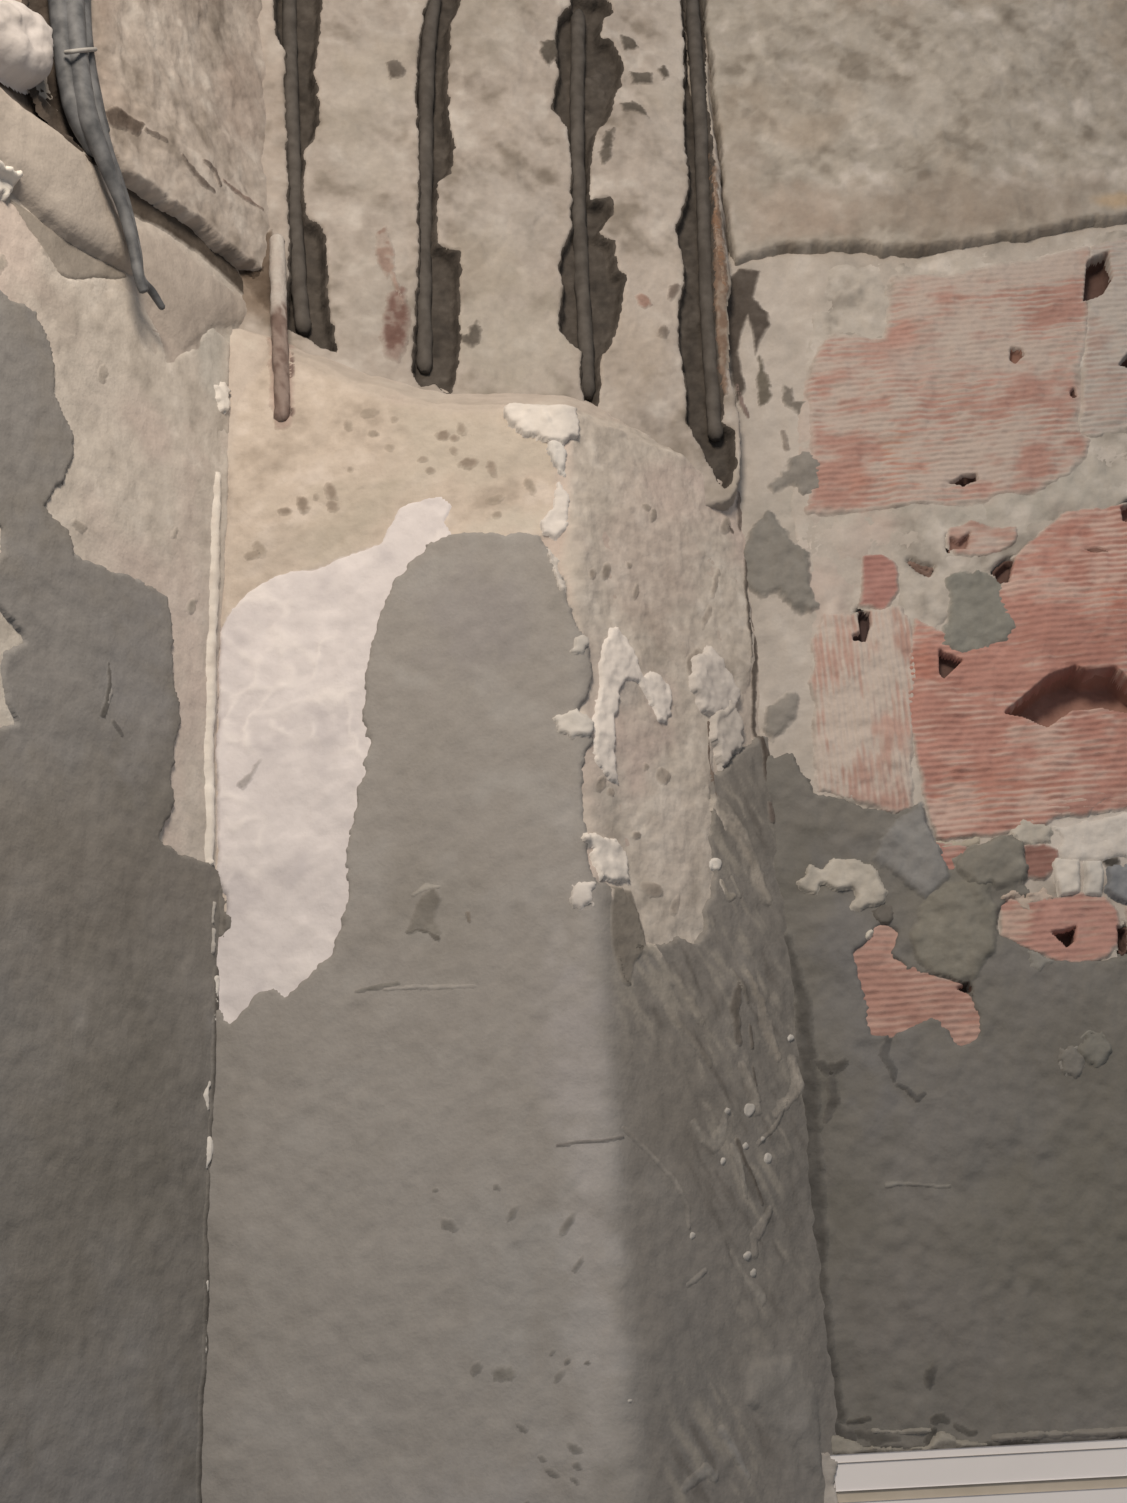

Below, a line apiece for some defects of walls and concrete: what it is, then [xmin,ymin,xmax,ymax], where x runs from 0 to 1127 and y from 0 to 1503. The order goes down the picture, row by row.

rust [238,229,274,314]
rust [265,336,297,431]
flaking render [0,0,755,945]
flaking render [790,230,1127,972]
flaking render [853,925,980,1046]